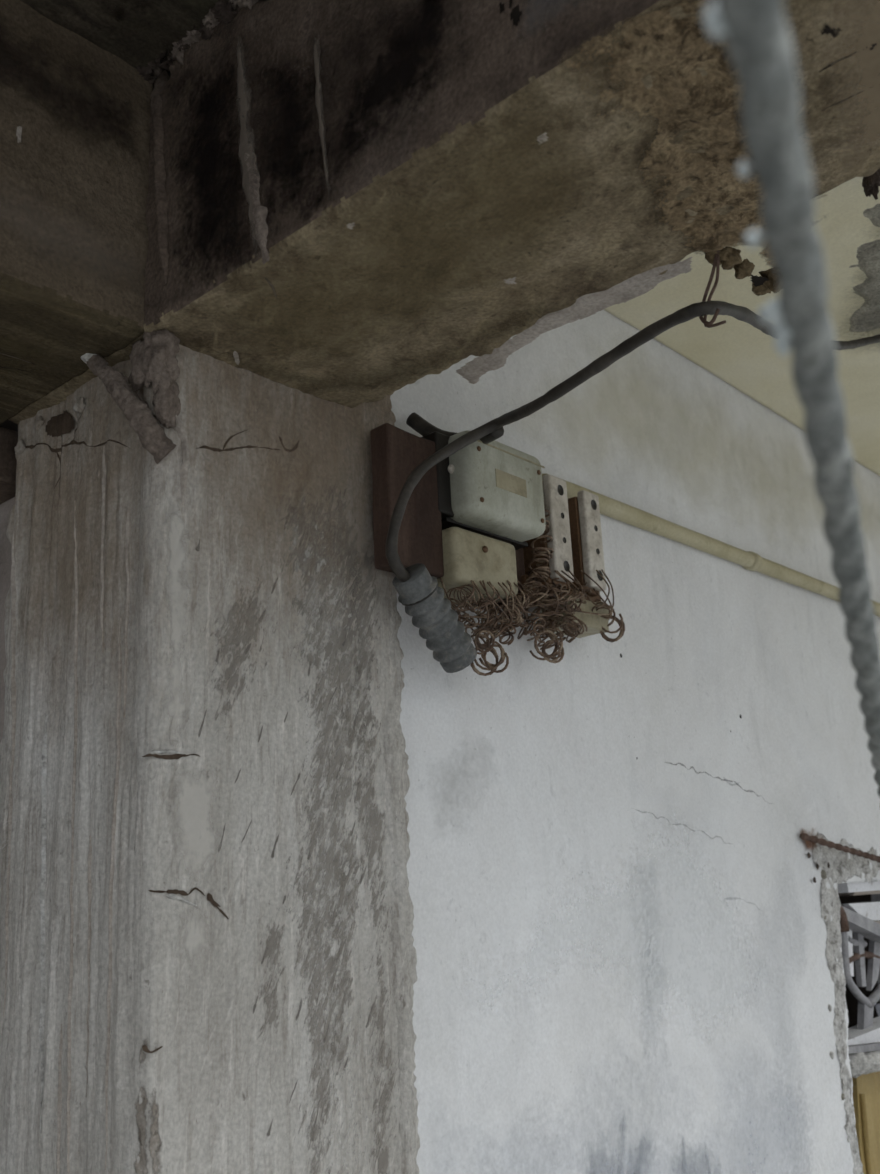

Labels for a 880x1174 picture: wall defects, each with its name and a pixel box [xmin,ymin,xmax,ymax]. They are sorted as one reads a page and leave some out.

water stain [344,0,442,150]
water stain [180,65,314,270]
flaking render [849,168,880,339]
spalling [34,397,86,437]
crack [25,412,131,489]
crack [196,429,299,452]
crack [142,749,201,759]
rust [802,831,830,883]
crack [149,887,229,960]
spalling [812,832,880,1174]
spalling [139,1040,162,1063]
spalling [134,1087,162,1174]